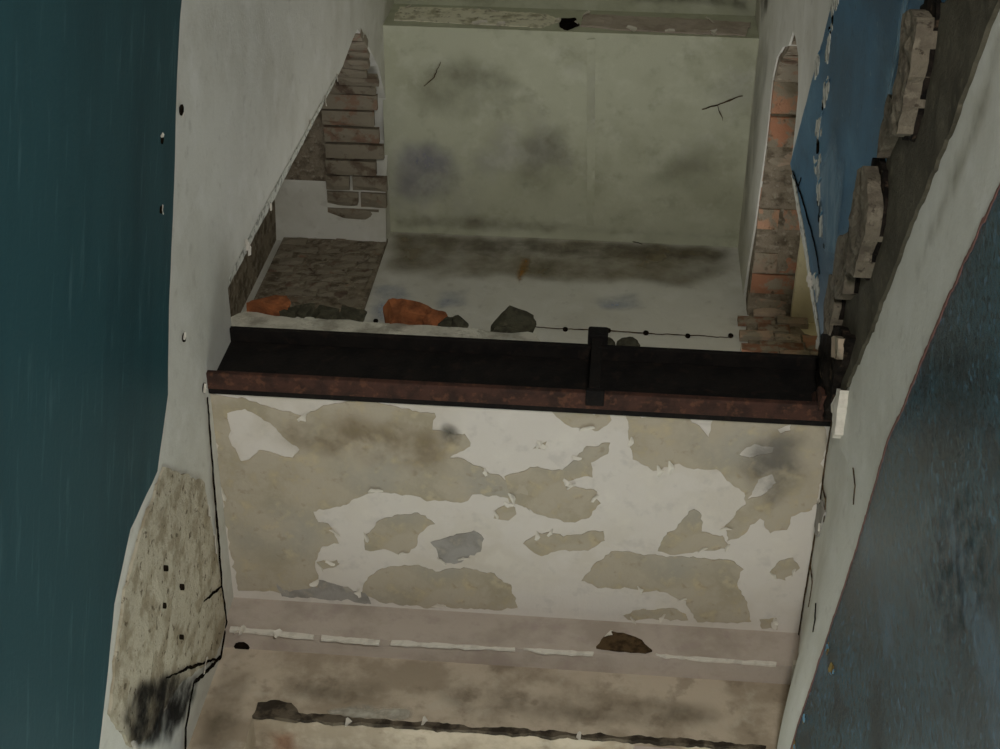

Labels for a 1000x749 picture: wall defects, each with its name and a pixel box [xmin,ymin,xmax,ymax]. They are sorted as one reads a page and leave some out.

leakage [468,242,594,277]
leakage [598,246,714,280]
flaking render [107,0,856,749]
crack [798,421,832,635]